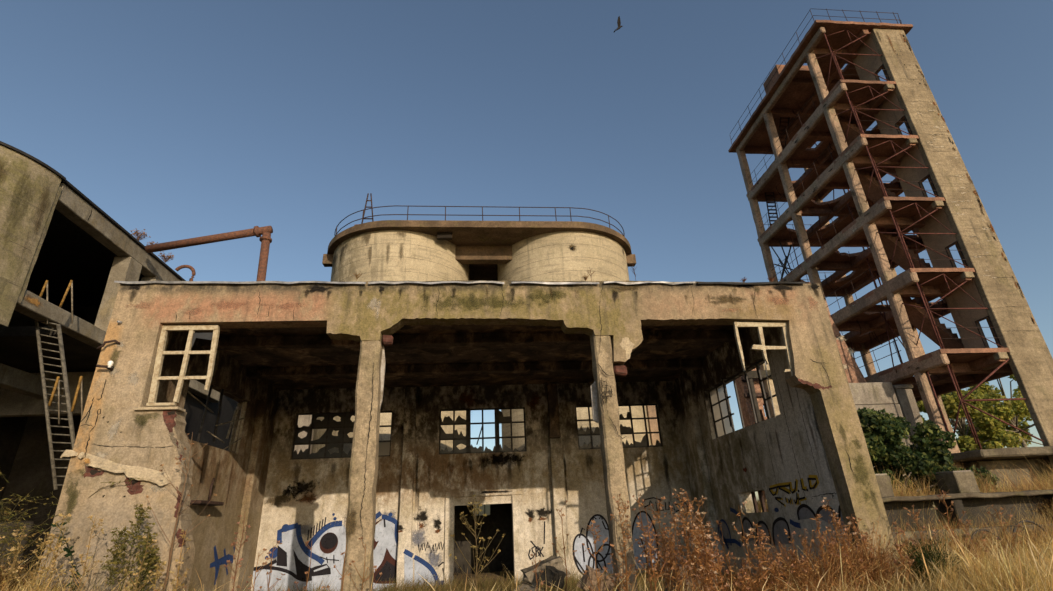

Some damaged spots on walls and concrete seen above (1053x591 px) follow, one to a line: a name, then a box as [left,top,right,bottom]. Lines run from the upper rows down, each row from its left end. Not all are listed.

water stain [434,288,565,310]
flaking render [600,337,634,412]
flaking render [60,450,186,547]
crack [81,380,171,456]
spalling [162,410,184,470]
water stain [855,439,869,499]